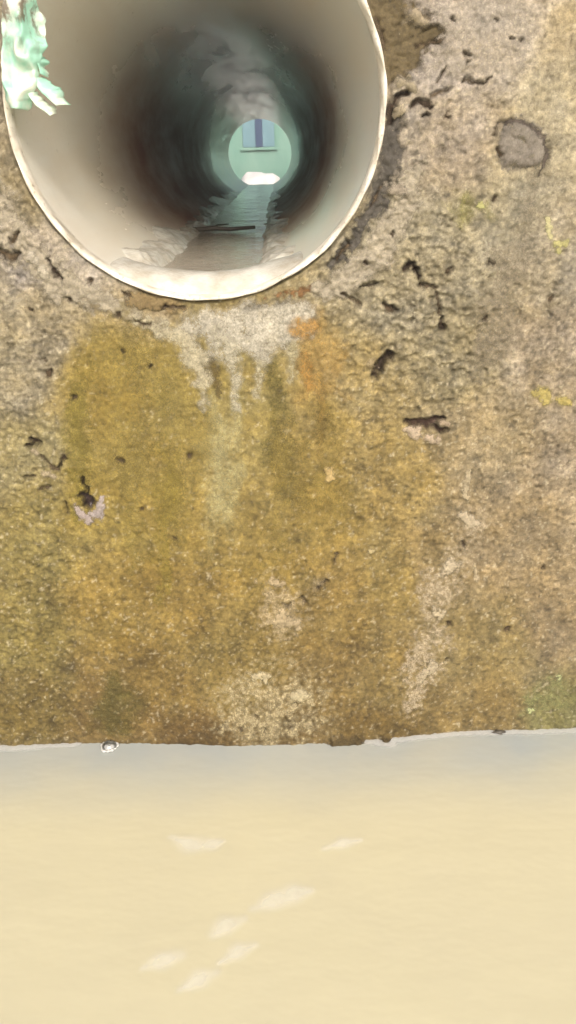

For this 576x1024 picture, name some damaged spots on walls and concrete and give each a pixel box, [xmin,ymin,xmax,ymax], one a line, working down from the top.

spalling [65,476,105,525]
leakage [133,297,315,521]
corrosion [289,304,347,460]
spalling [403,415,451,445]